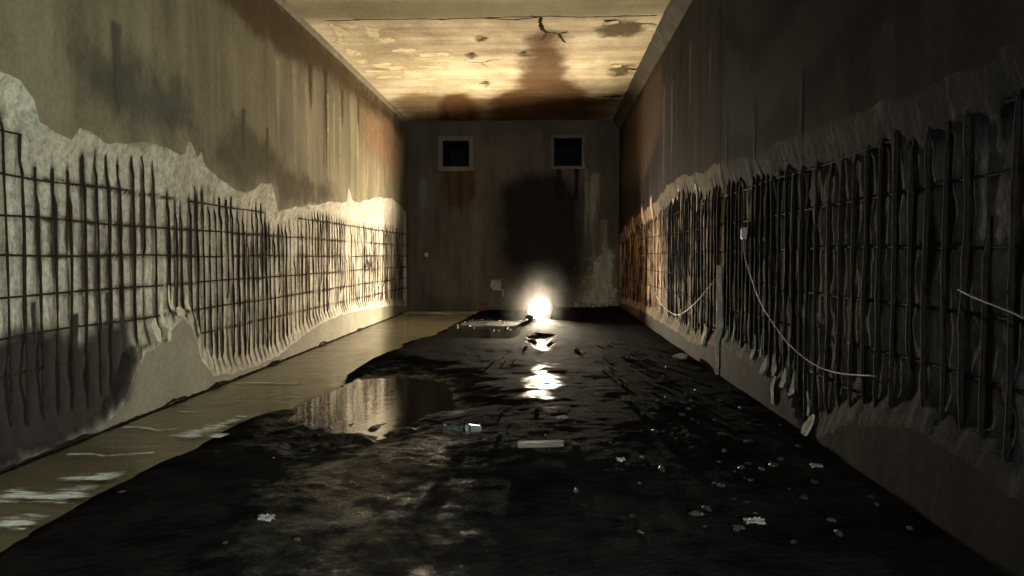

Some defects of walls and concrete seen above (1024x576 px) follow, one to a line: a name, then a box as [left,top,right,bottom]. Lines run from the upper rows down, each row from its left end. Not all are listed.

leakage [90,23,190,129]
crack [325,15,658,43]
spalling [609,64,637,77]
spalling [0,71,406,428]
spalling [620,33,1024,505]
spalling [69,400,126,440]